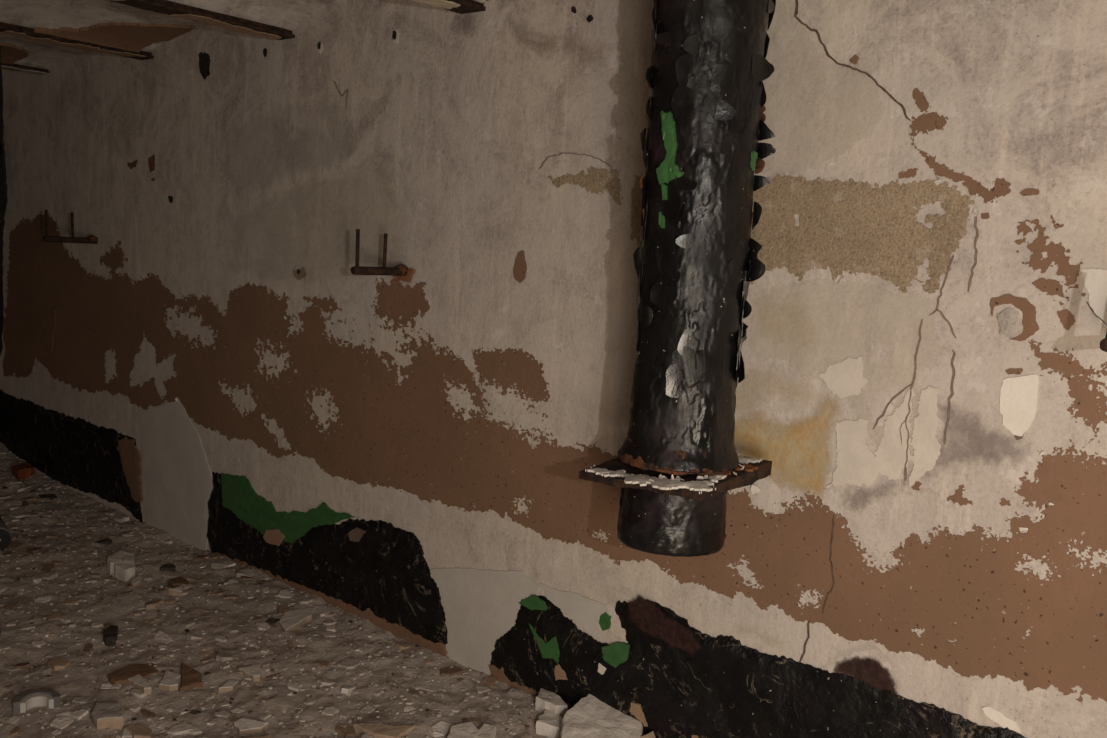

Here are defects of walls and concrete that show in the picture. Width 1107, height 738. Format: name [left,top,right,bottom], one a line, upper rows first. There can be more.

peeling [0,14,281,65]
peeling [413,0,460,9]
crack [794,0,911,121]
peeling [127,154,155,181]
flaking render [548,65,681,328]
flaking render [736,0,1039,383]
crack [873,212,979,481]
peeling [0,211,1107,703]
leakage [734,399,834,493]
crack [799,515,835,663]